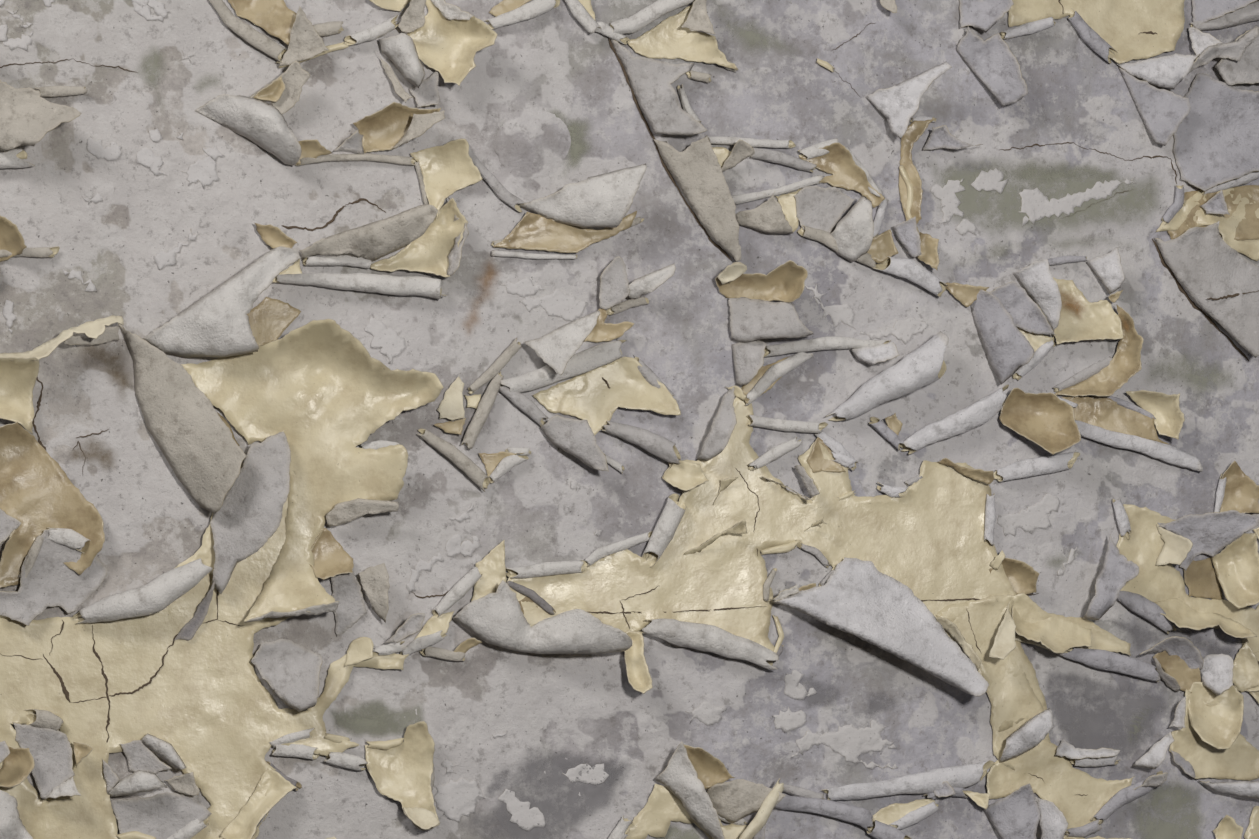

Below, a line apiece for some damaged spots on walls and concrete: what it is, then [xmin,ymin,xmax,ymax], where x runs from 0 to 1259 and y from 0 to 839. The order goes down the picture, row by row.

crack [282,198,386,231]
crack [1000,142,1177,217]
peeling [956,0,1259,361]
peeling [0,0,1203,694]
crack [736,469,760,556]
crack [1,590,244,743]
peeling [251,639,323,712]
crack [590,586,767,629]
crack [921,598,982,654]
peeling [654,461,1259,839]
peeling [0,709,545,839]
flaking render [563,763,609,785]